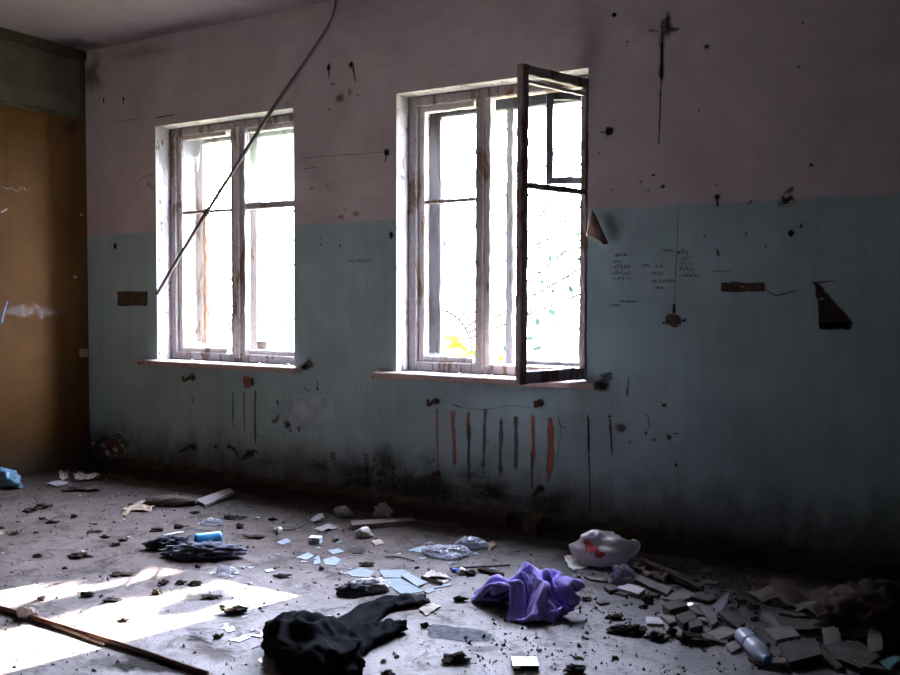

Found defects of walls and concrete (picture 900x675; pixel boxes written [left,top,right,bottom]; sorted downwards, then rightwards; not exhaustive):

spalling [811,281,854,331]
water stain [214,390,259,457]
water stain [467,409,509,500]
water stain [608,415,626,453]